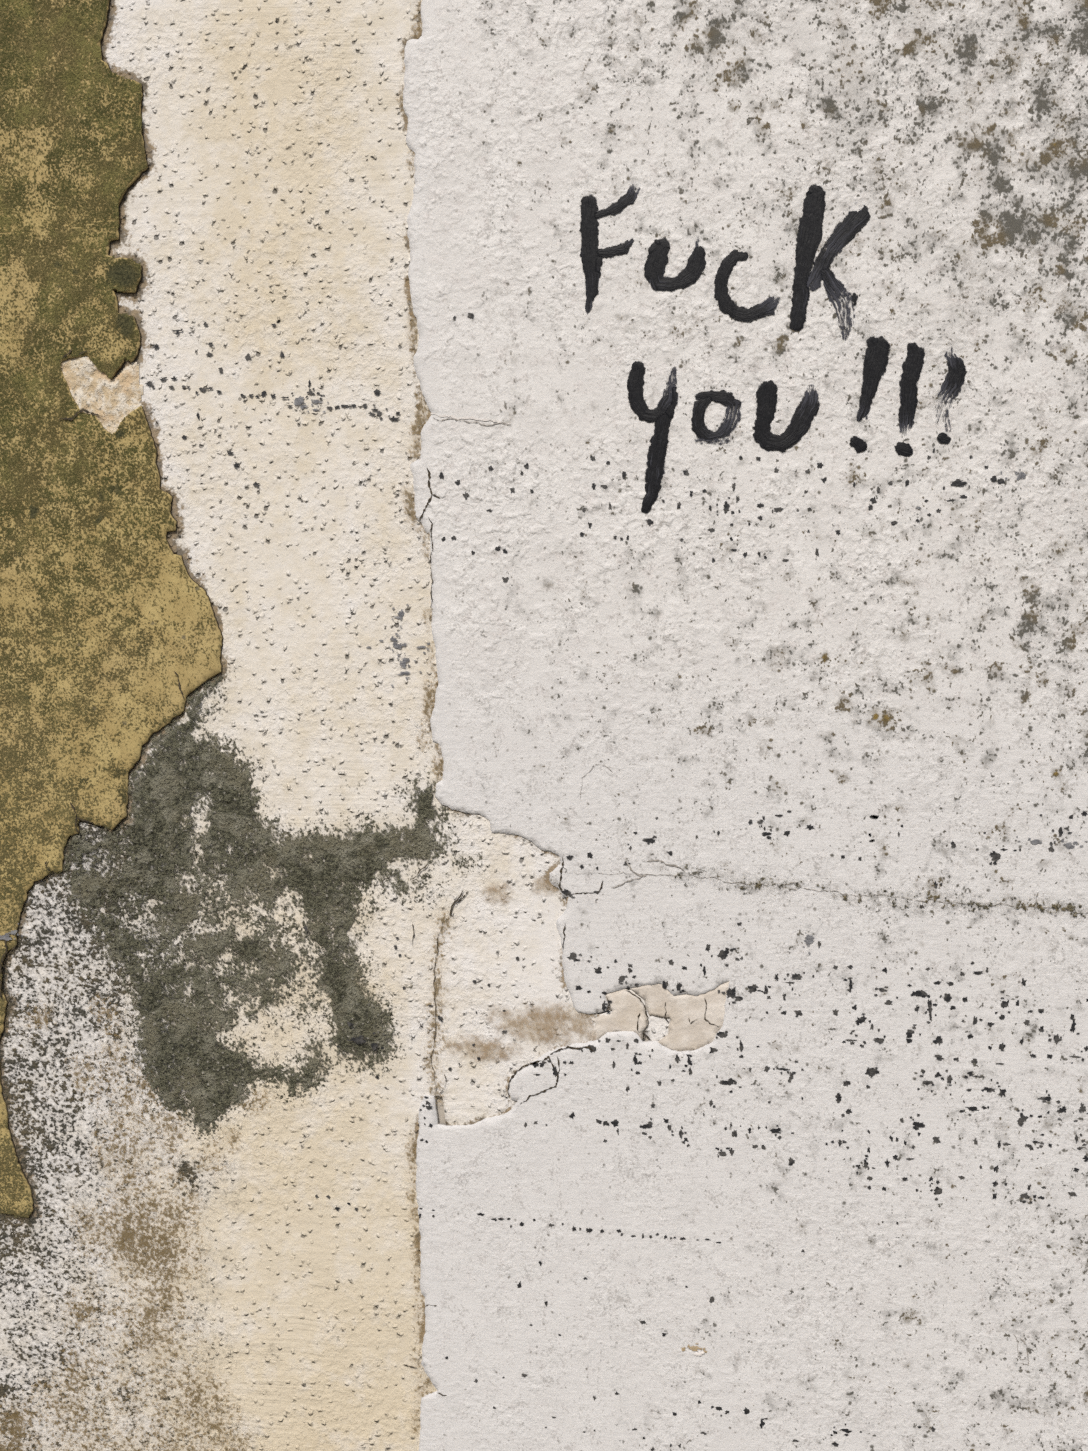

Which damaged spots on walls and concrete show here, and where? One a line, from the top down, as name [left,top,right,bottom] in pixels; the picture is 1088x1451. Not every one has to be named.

leakage [566,0,1088,1014]
peeling [0,0,827,1451]
leakage [543,630,620,823]
leakage [0,663,482,1451]
leakage [447,1007,591,1060]
peeling [825,1067,879,1149]
peeling [832,965,886,1047]
peeling [856,1114,942,1200]
peeling [874,961,1088,1116]
leakage [932,972,1079,1071]
peeling [979,1090,1088,1206]
leakage [807,1062,1088,1451]